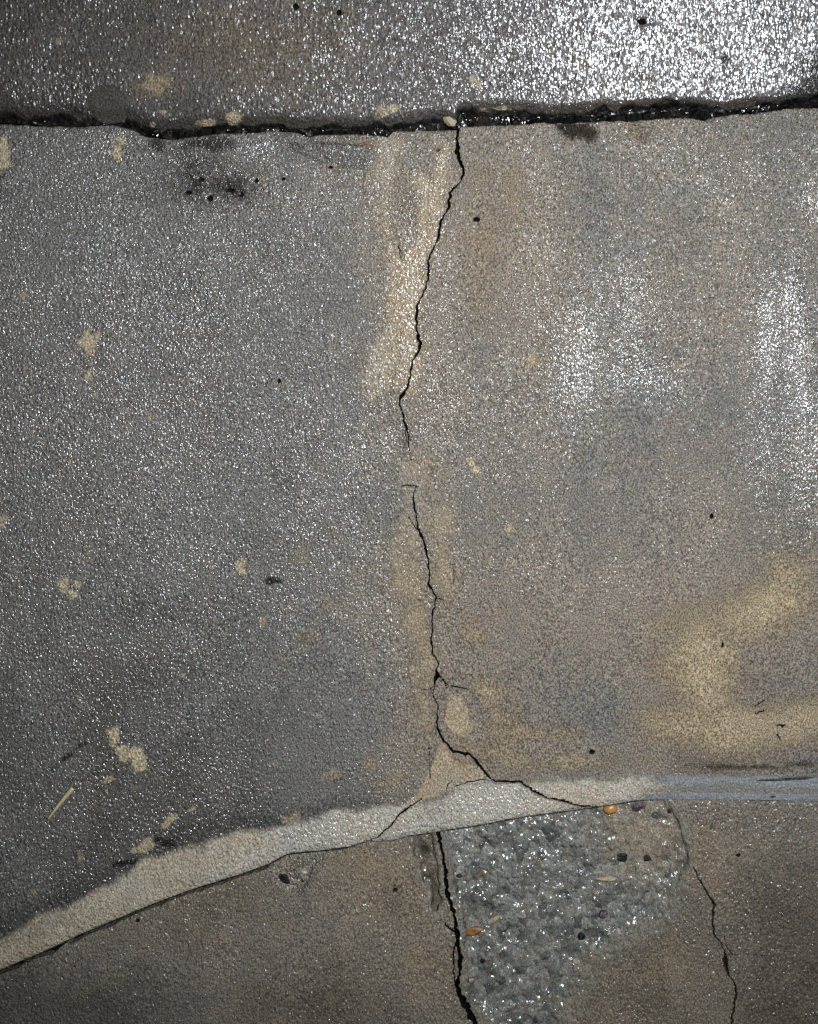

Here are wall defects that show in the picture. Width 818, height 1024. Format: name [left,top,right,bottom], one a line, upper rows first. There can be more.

crack [372,127,603,841]
crack [431,831,481,1024]
spalling [404,800,698,1024]
crack [690,866,742,1024]